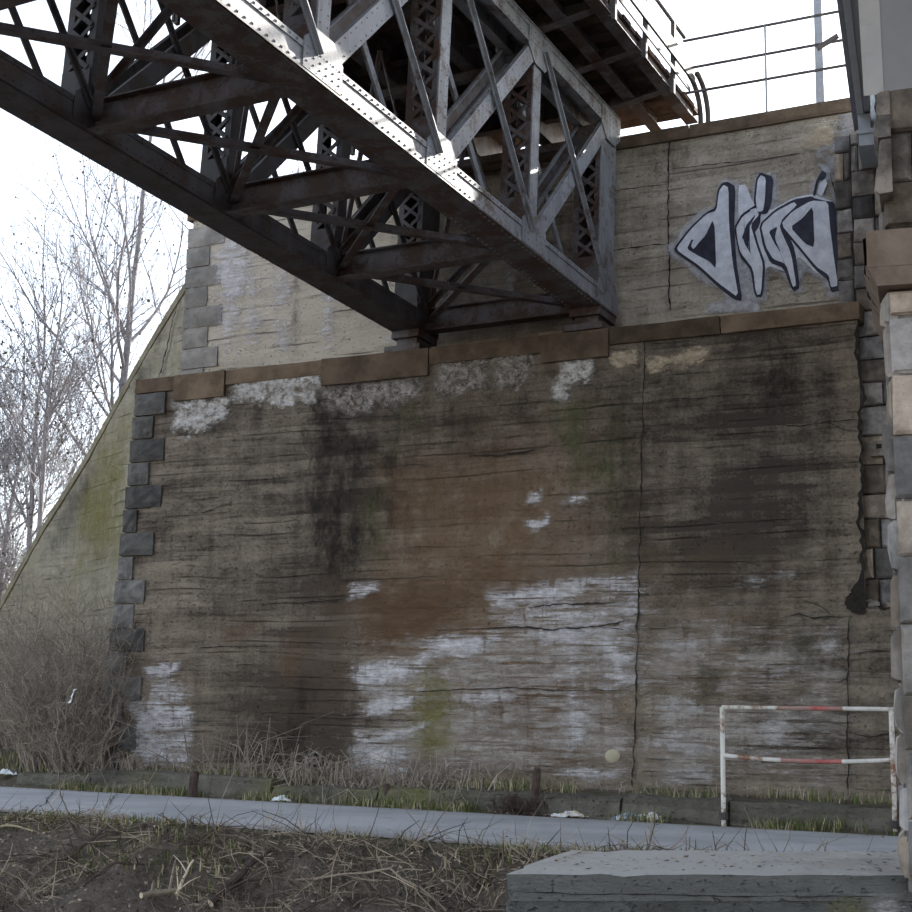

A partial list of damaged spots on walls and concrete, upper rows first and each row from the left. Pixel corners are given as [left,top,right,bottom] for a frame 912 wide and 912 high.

crack [616,123,799,310]
leakage [526,516,550,527]
crack [421,341,748,787]
leakage [130,663,193,766]
leakage [353,577,643,774]
leakage [567,769,625,777]